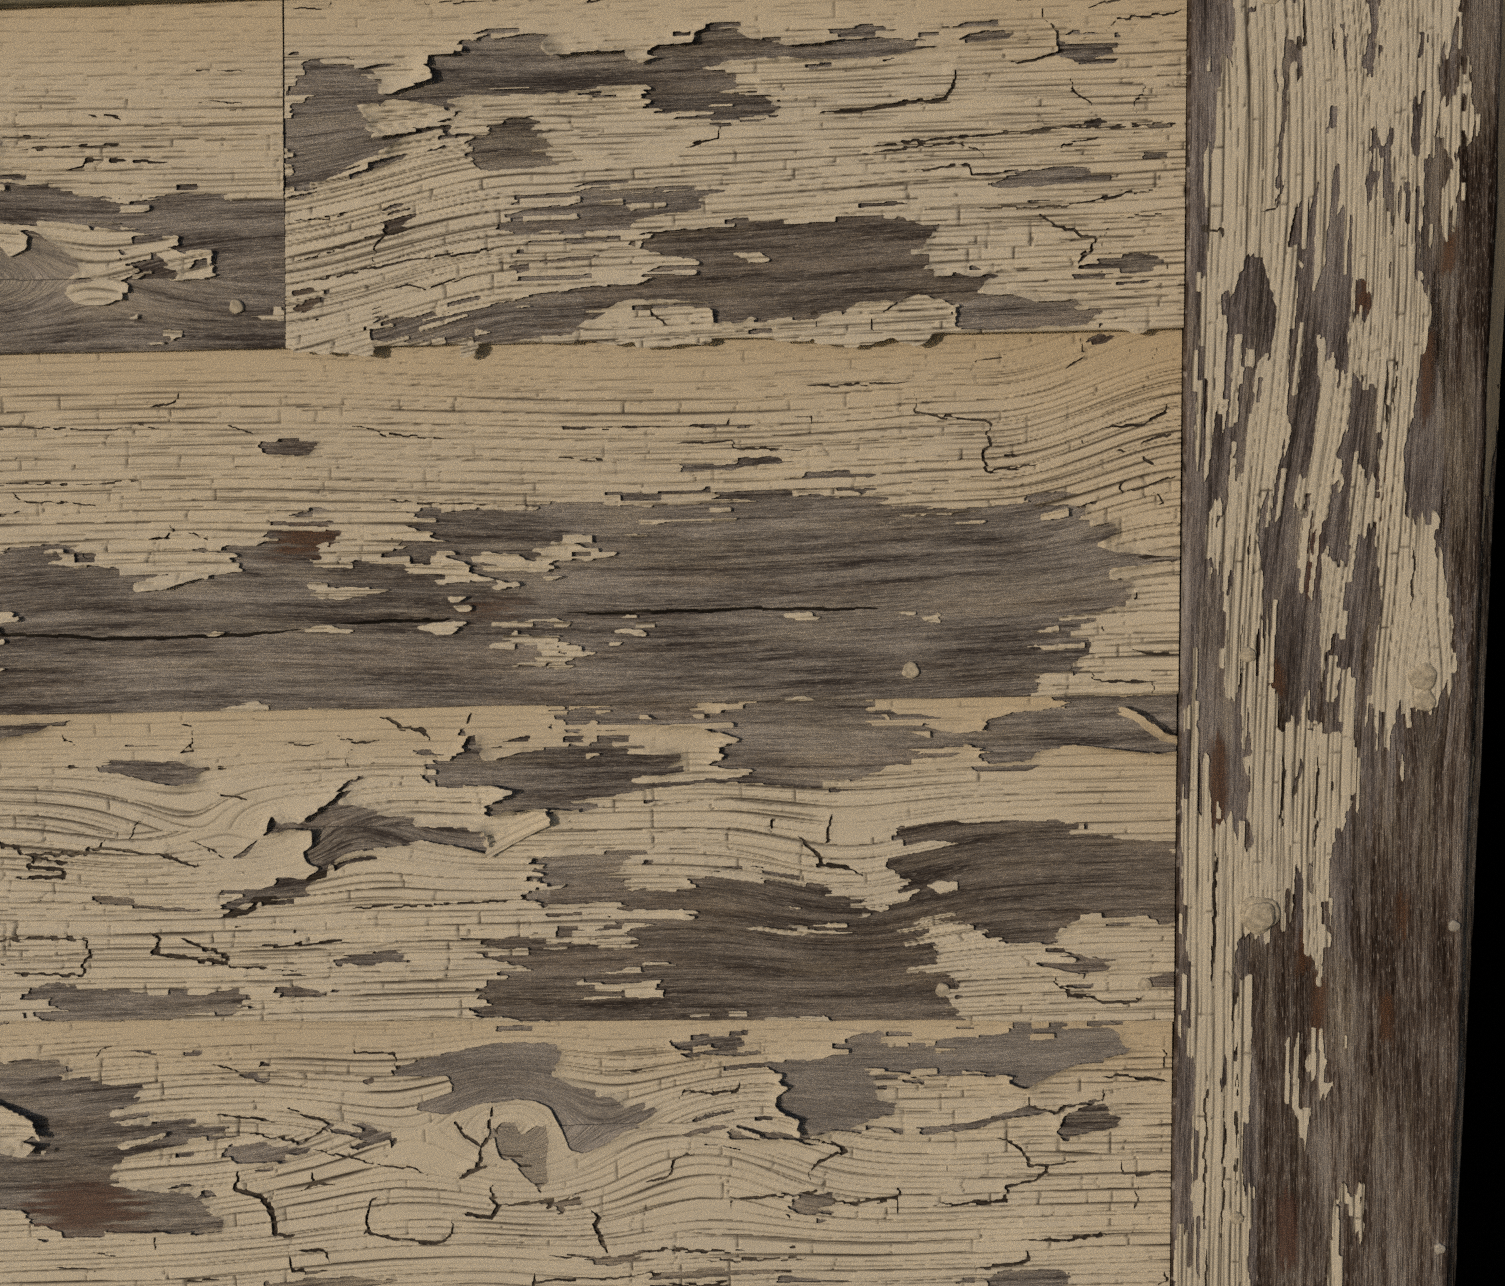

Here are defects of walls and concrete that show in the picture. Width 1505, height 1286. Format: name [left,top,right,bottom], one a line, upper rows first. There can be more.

peeling [0,22,937,354]
crack [820,0,1182,275]
peeling [0,487,1180,912]
peeling [370,0,1276,1276]
peeling [1220,0,1503,1286]
crack [0,821,224,880]
crack [0,935,93,977]
peeling [31,982,246,1022]
peeling [0,1058,310,1236]
crack [218,1101,797,1286]
crack [679,1081,741,1099]
crack [730,1127,901,1213]